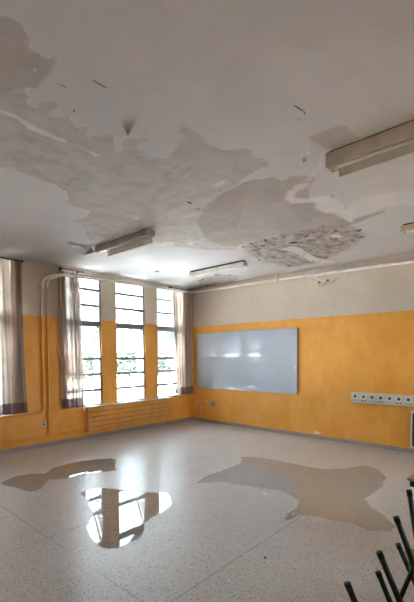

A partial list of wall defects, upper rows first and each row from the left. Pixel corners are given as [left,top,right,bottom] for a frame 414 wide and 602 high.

peeling [0,93,414,268]